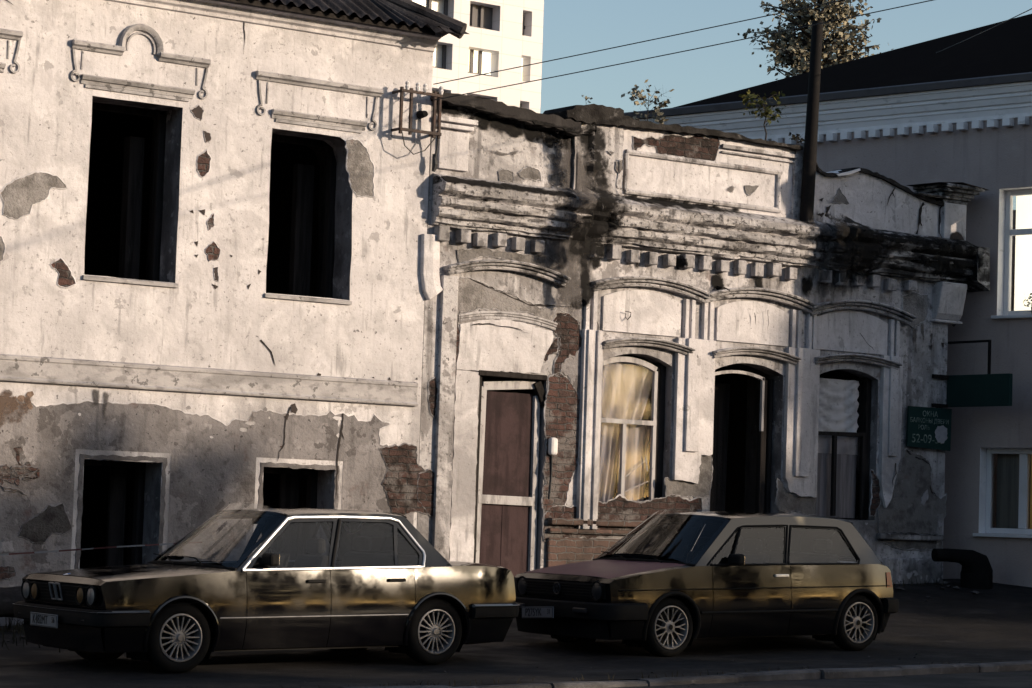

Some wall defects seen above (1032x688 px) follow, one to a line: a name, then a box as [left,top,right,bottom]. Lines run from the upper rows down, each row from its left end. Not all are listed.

flaking render [0,171,68,220]
flaking render [49,258,77,289]
flaking render [190,105,212,178]
flaking render [345,138,375,198]
leakage [433,101,739,309]
flaking render [632,133,720,161]
leakage [802,213,985,296]
crack [916,202,943,237]
peeling [0,390,435,587]
crack [277,407,291,461]
crack [336,413,344,494]
flaking render [455,276,713,542]